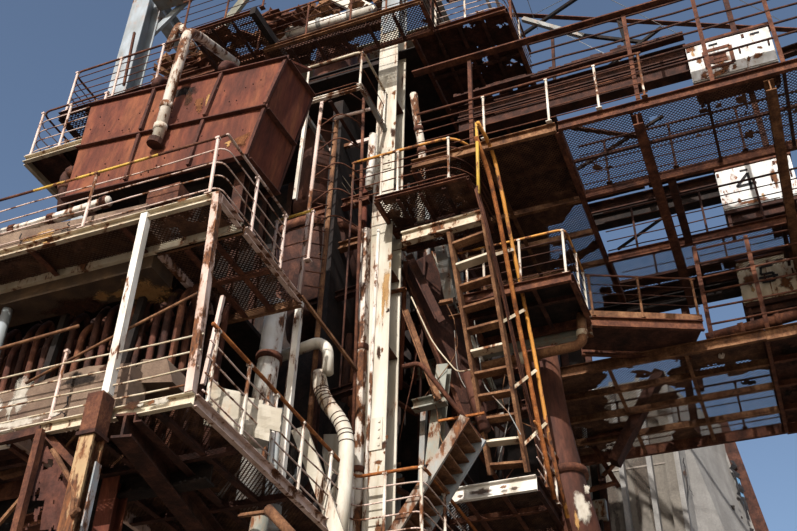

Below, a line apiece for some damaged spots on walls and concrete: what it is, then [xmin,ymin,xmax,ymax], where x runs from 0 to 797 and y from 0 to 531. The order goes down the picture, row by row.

rust [686,47,737,78]
rust [175,87,210,113]
rust [382,254,392,317]
rust [775,277,794,290]
peeling [0,412,59,428]
peeling [575,486,590,528]